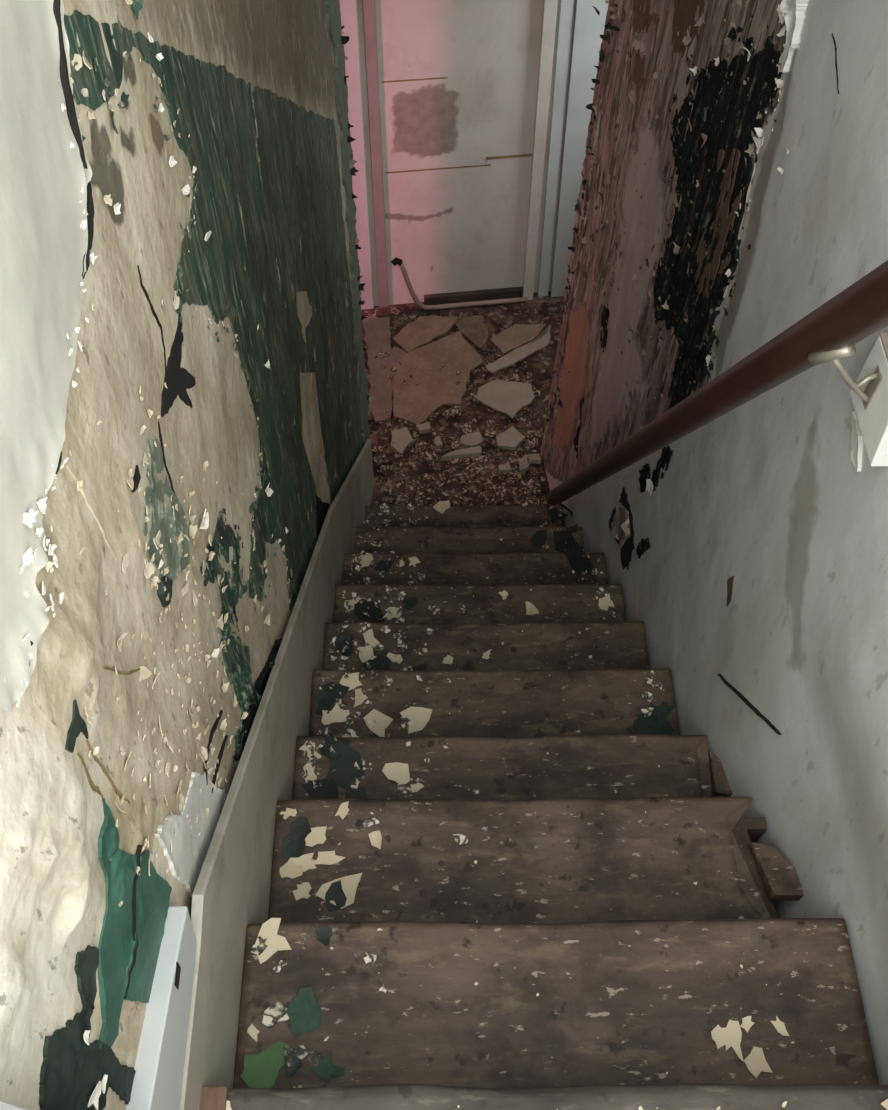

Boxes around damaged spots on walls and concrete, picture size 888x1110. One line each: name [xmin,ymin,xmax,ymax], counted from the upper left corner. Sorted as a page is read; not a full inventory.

crack [53,0,95,279]
damp [393,85,458,157]
spalling [541,0,809,483]
damp [715,49,796,374]
crack [131,265,196,499]
peeling [0,0,374,1110]
peeling [301,503,441,789]
peeling [350,759,423,830]
peeling [453,833,468,846]
spalling [609,446,674,570]
crack [718,674,782,735]
peeling [364,951,386,993]